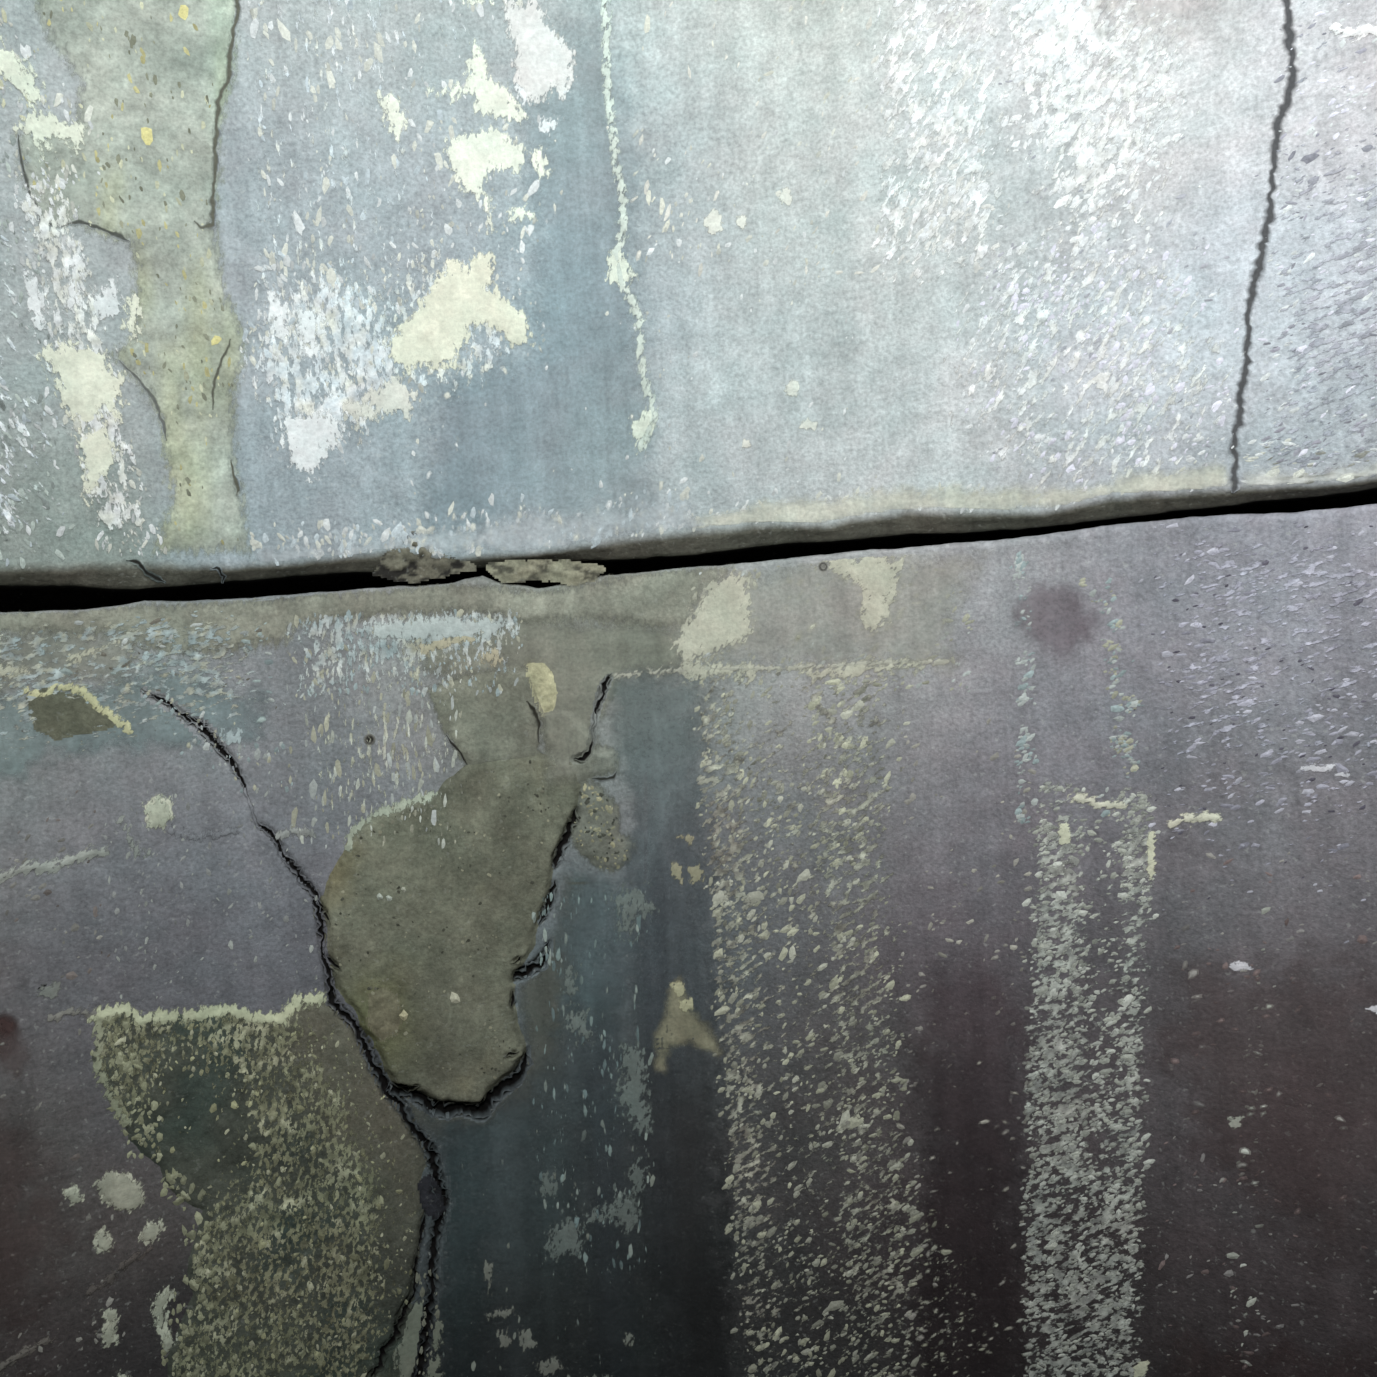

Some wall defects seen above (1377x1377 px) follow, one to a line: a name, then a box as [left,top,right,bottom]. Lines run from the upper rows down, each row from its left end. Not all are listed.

crack [17,135,130,242]
crack [193,0,243,230]
crack [1227,0,1301,493]
crack [118,359,167,441]
spalling [372,531,606,586]
spalling [19,680,134,741]
peeling [526,663,558,718]
crack [124,673,534,1377]
water stain [392,551,1284,1377]
water stain [1170,889,1305,1070]
peeling [87,987,446,1377]
water stain [1173,1081,1312,1235]